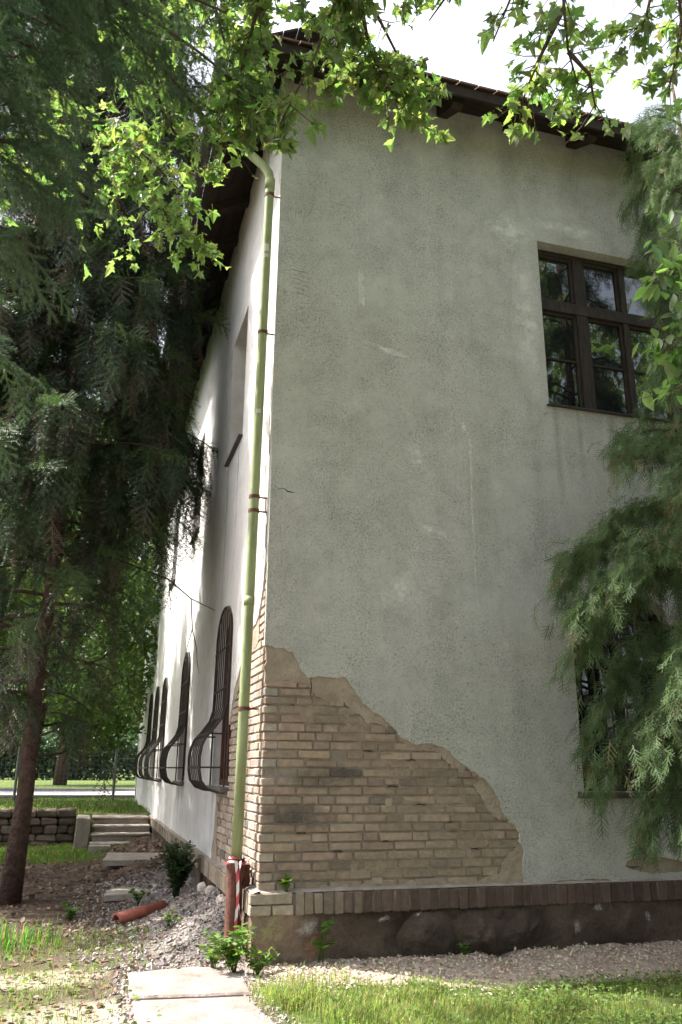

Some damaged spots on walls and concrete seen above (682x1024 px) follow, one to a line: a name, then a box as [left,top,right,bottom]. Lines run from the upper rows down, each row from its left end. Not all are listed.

spalling [212,570,524,891]
spalling [625,857,682,874]